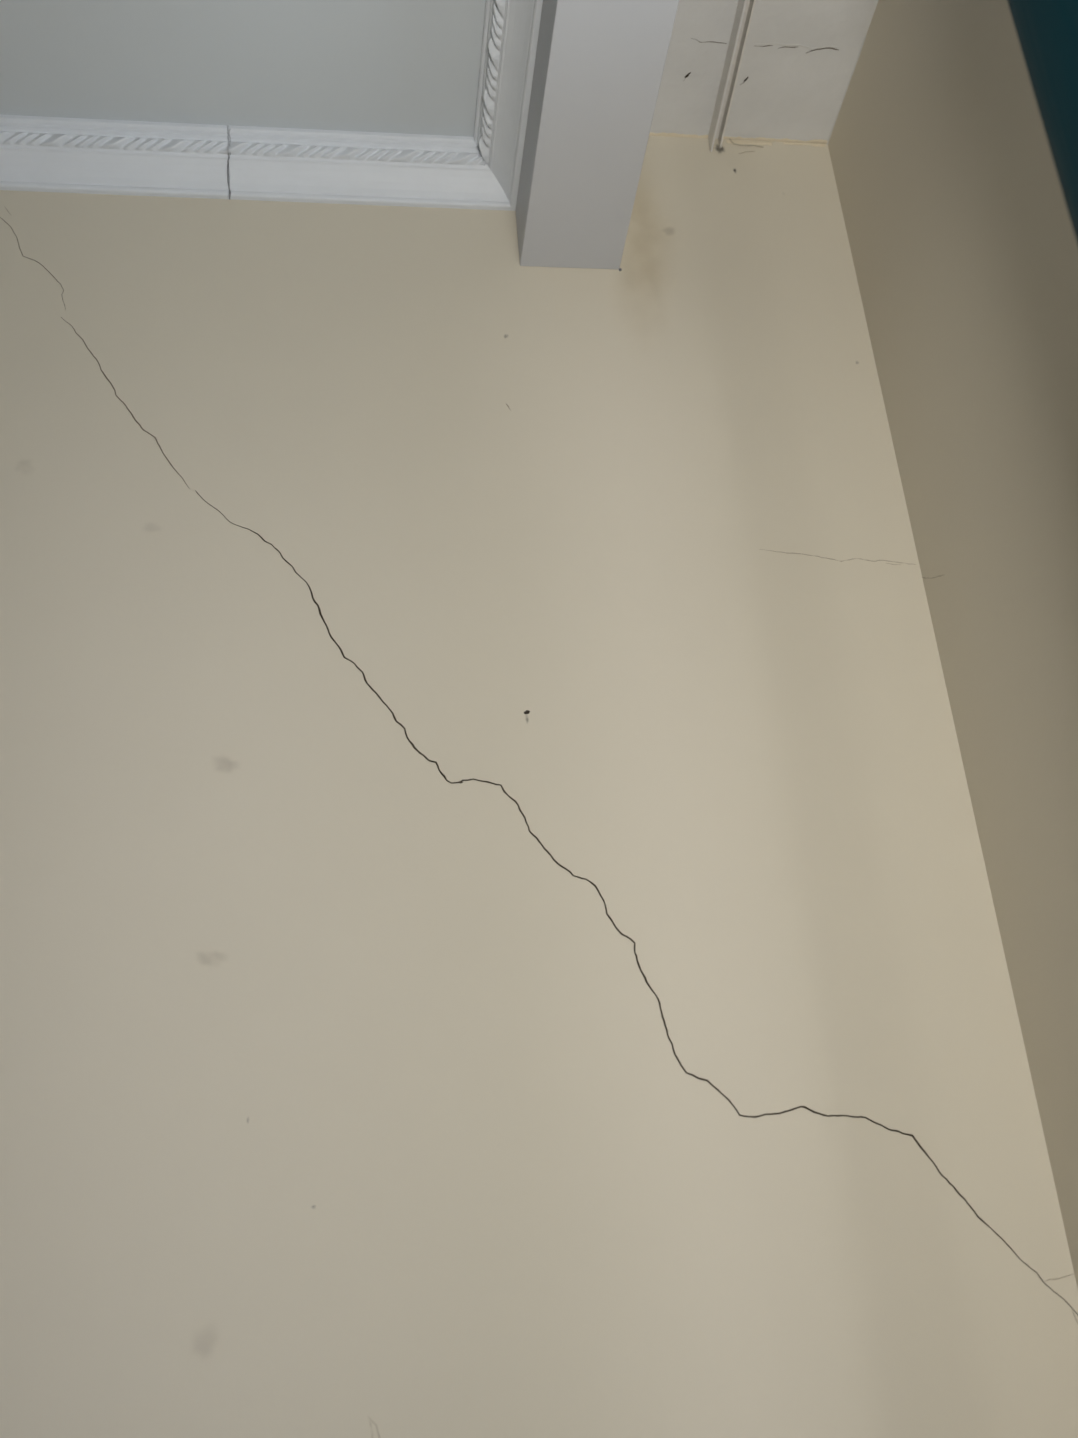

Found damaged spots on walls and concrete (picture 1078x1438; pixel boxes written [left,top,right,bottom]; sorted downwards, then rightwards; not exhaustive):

crack [0,207,1078,1323]